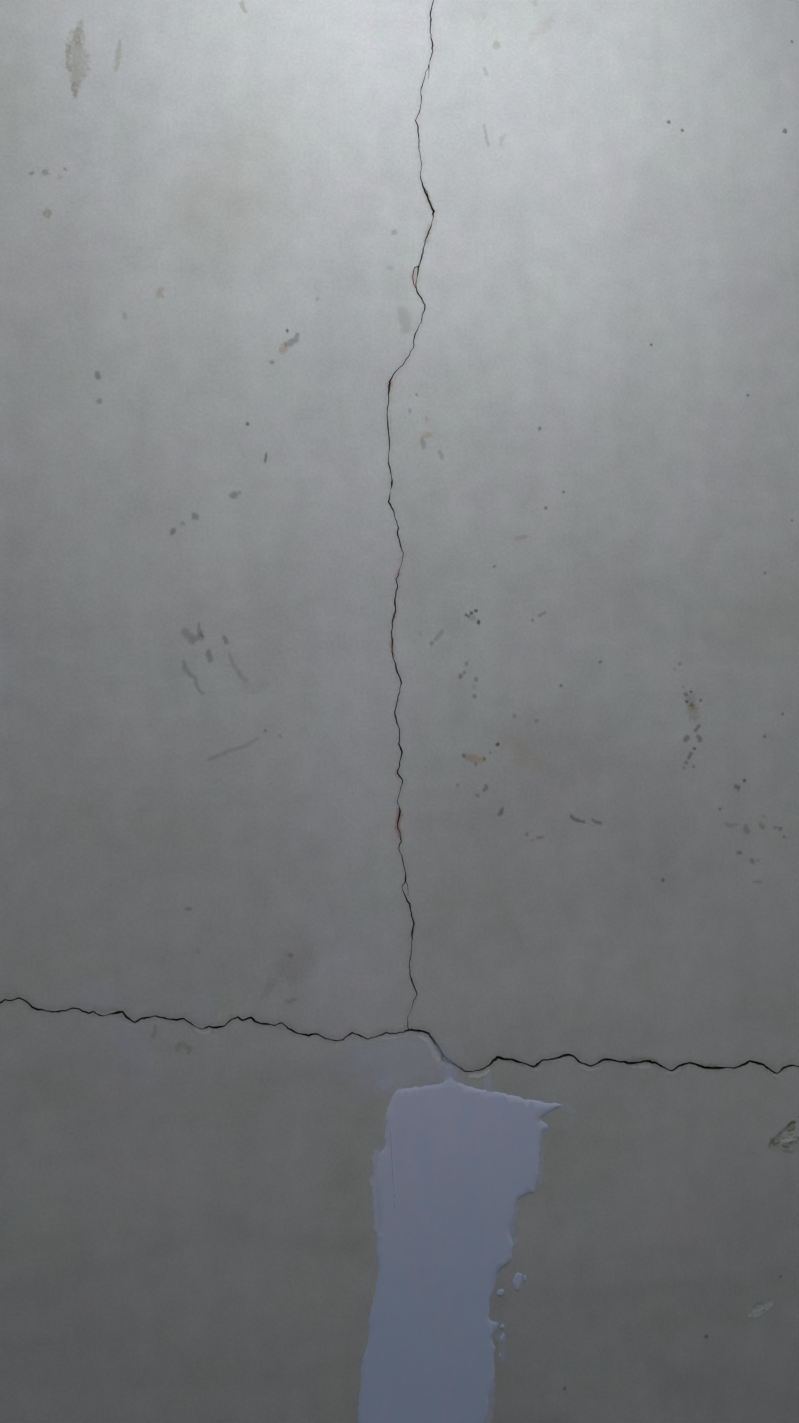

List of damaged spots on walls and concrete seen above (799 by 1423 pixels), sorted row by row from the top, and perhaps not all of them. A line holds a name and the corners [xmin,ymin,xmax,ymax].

crack [0,0,799,1078]
flaking render [766,1116,799,1153]